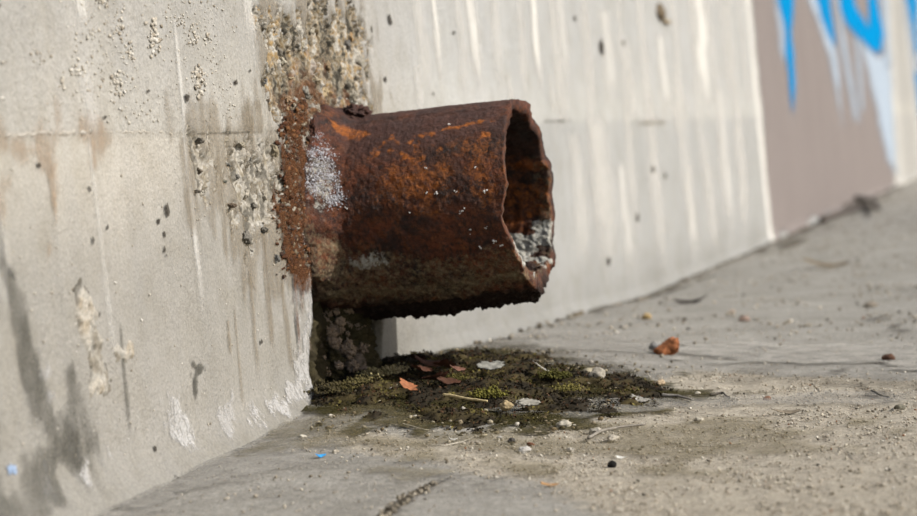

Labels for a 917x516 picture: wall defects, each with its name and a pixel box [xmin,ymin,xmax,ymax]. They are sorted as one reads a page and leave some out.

corrosion [272,86,323,340]
spalling [248,0,376,131]
corrosion [343,103,373,119]
damp [0,236,92,485]